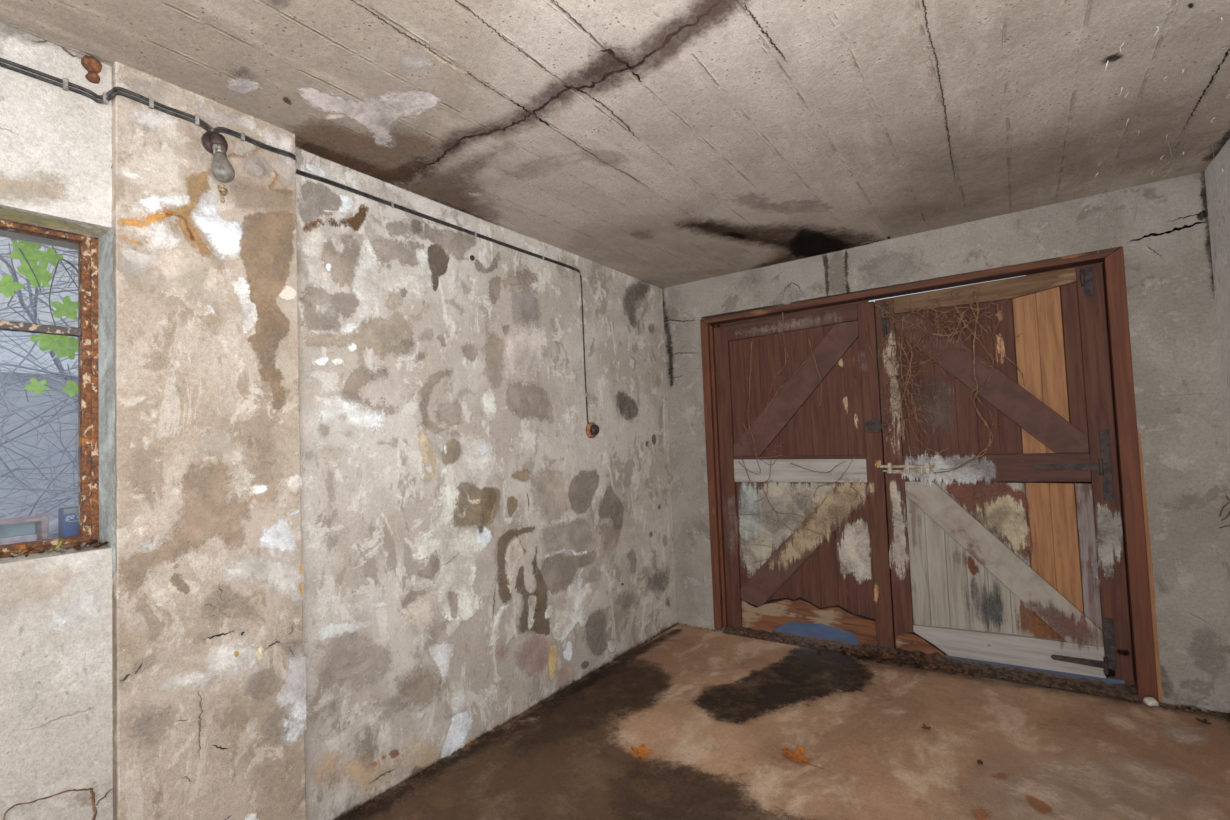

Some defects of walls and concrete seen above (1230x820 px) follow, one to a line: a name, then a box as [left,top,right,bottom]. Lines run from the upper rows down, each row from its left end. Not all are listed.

crack [351,0,786,190]
crack [1178,49,1230,138]
flaking render [197,101,406,213]
water stain [294,87,500,217]
rust [118,172,210,255]
water stain [687,194,915,295]
crack [1127,214,1209,258]
peeling [488,538,592,661]
spalling [370,743,421,767]
water stain [971,757,1209,820]